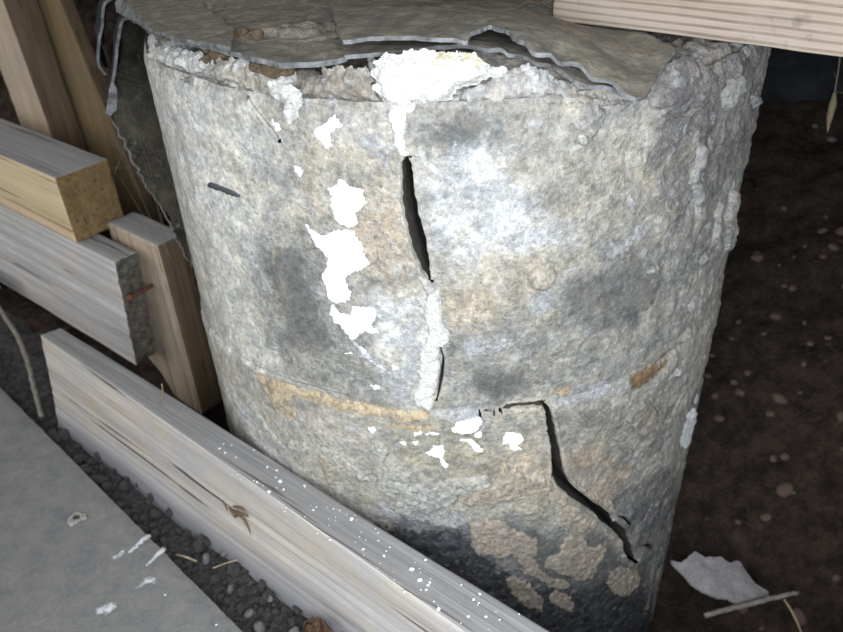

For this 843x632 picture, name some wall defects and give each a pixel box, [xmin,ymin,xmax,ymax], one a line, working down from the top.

spalling [145,44,632,131]
peeling [314,115,343,148]
crack [396,156,434,281]
peeling [305,179,399,371]
corrosion [255,374,436,432]
peeling [425,445,448,468]
crack [433,346,448,401]
peeling [451,416,484,452]
peeling [502,432,524,451]
crack [500,397,658,615]
leakage [375,500,653,632]
peeling [469,494,617,613]